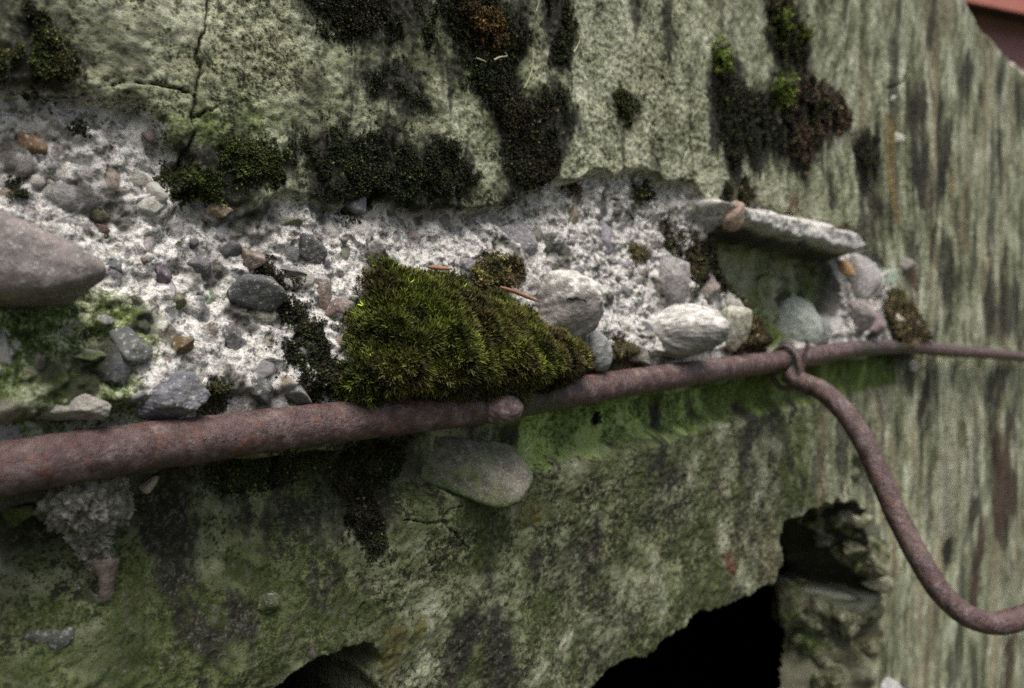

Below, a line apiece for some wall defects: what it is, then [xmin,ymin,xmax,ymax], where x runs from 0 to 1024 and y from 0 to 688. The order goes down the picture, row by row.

crack [90,2,211,167]
spalling [0,84,898,441]
corrosion [0,396,490,498]
corrosion [520,338,1024,417]
corrosion [969,412,1019,608]
corrosion [1002,636,1014,688]